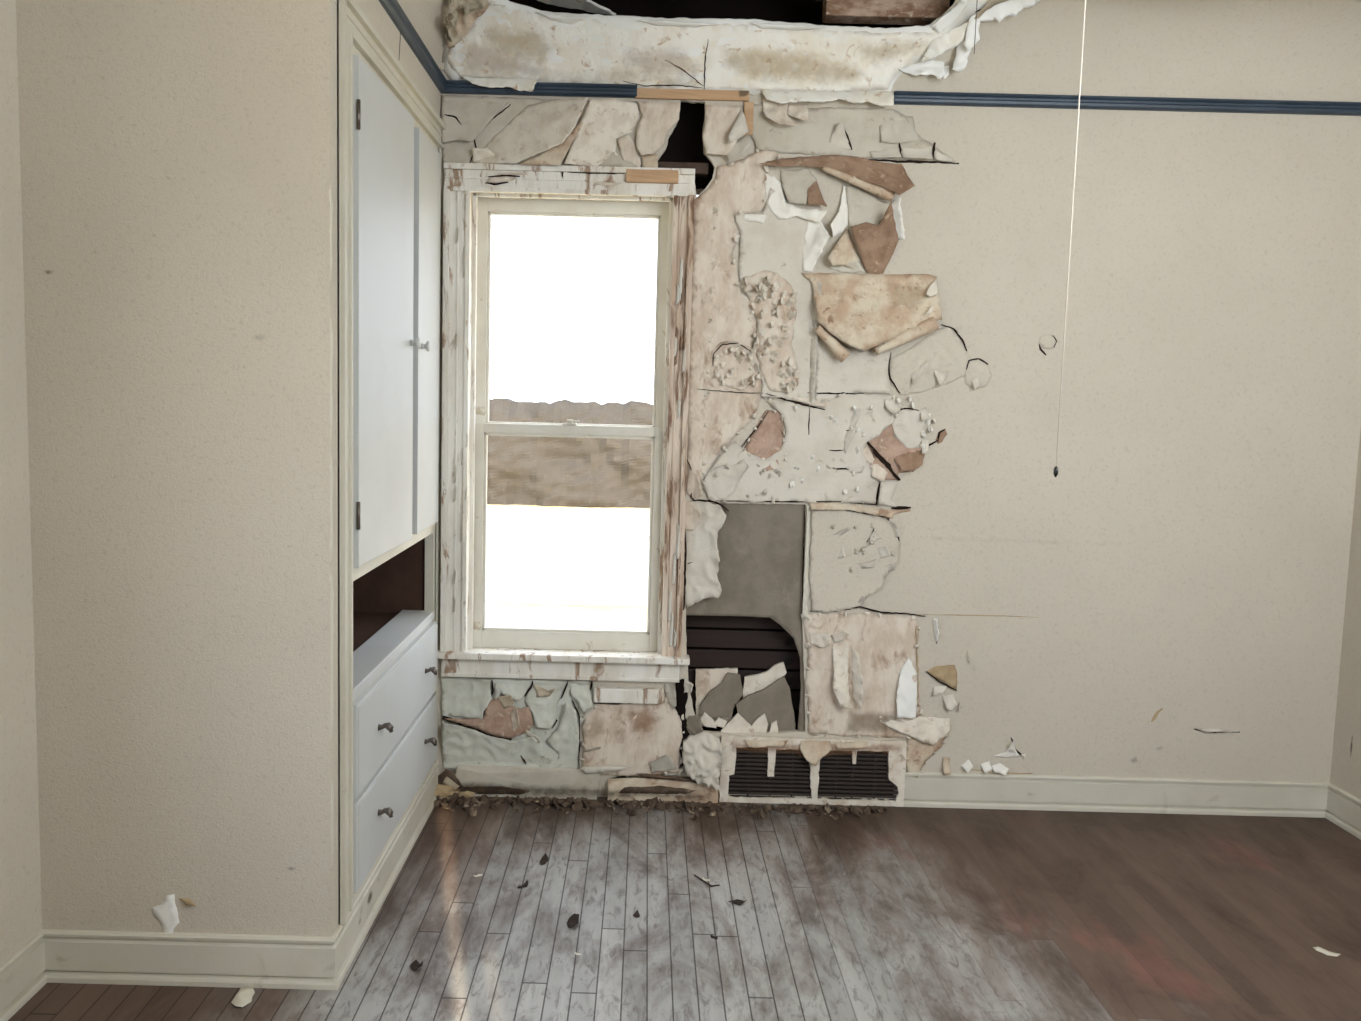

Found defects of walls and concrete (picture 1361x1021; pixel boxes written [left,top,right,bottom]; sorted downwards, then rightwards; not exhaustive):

leakage [447,4,945,92]
flaking render [438,0,1040,791]
peeling [152,894,197,933]